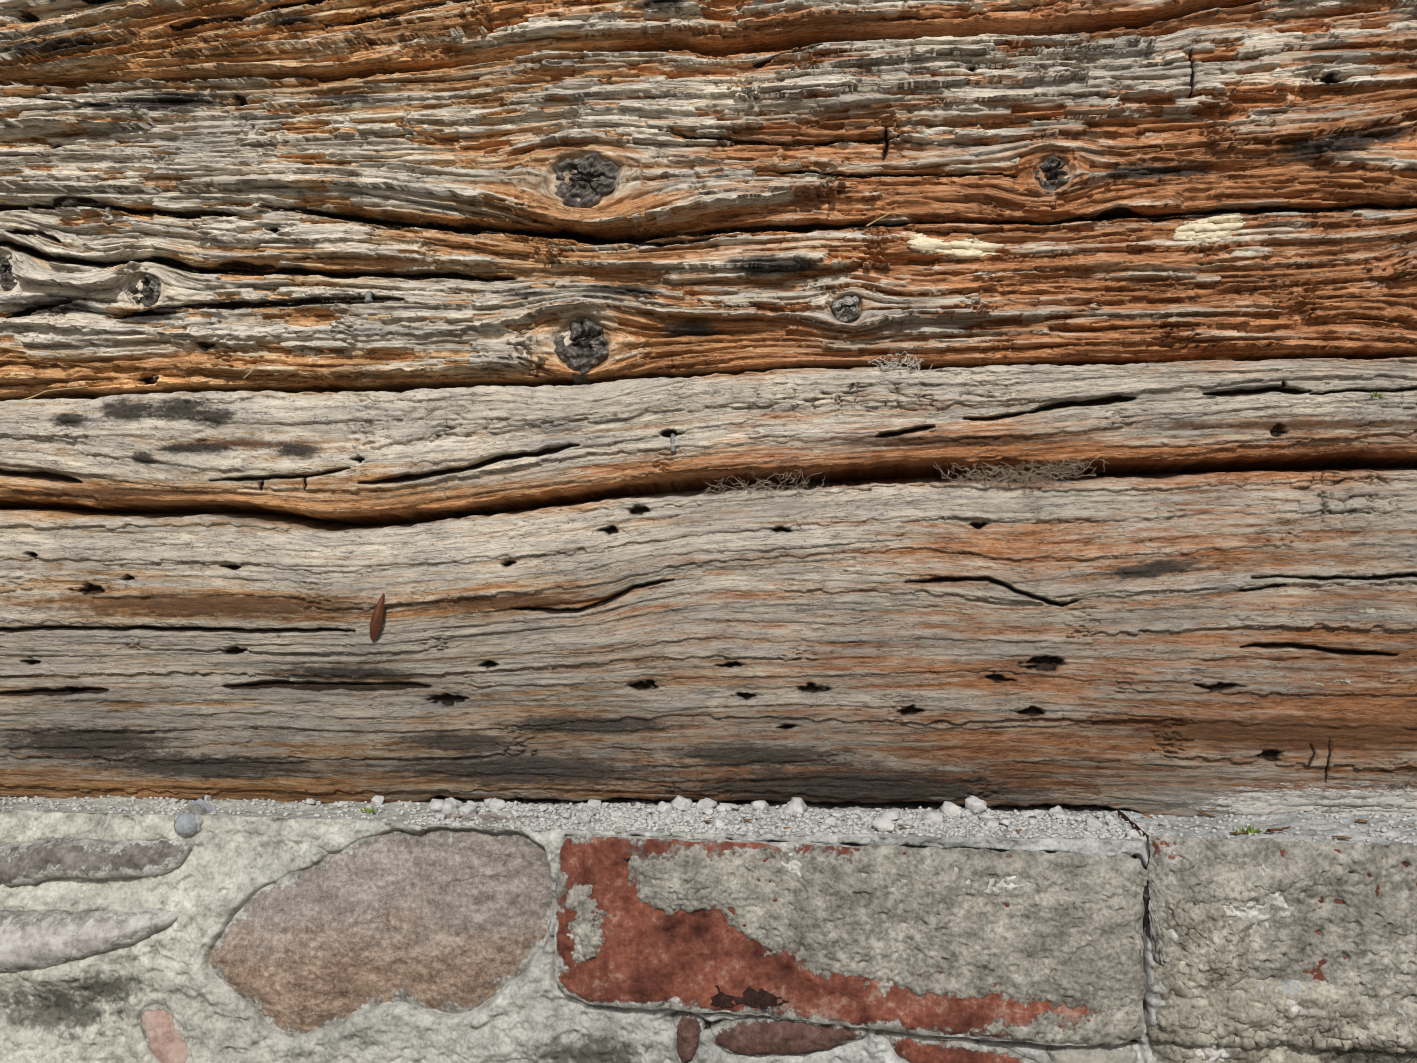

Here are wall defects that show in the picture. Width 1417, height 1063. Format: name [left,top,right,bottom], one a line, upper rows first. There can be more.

crack [209,411,580,491]
crack [1290,470,1390,516]
crack [518,579,675,613]
crack [905,577,1078,606]
crack [1238,573,1417,591]
crack [1240,643,1398,656]
crack [1307,741,1331,783]
spalling [562,882,615,967]
spalling [627,836,1417,1063]